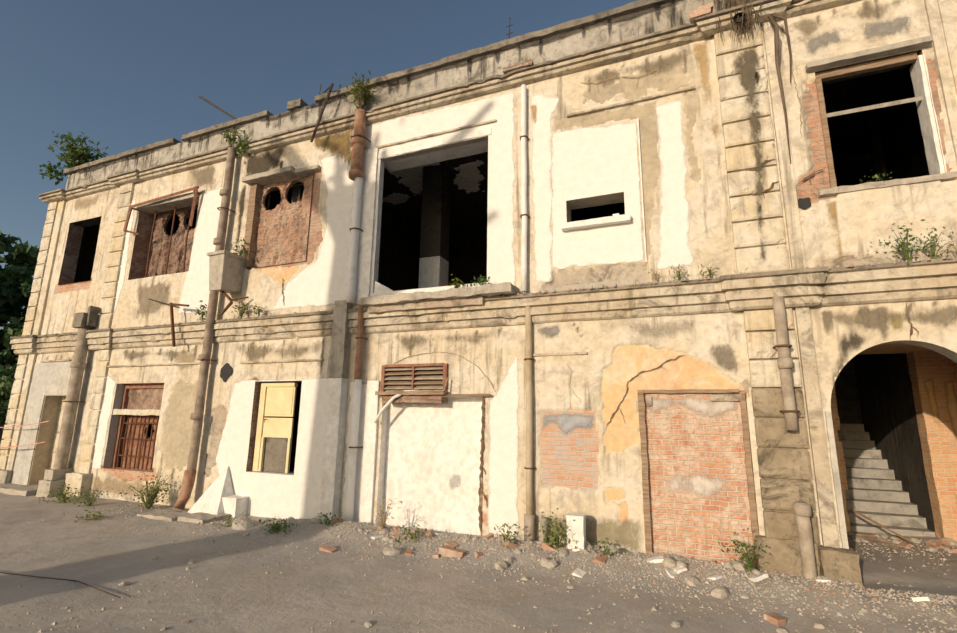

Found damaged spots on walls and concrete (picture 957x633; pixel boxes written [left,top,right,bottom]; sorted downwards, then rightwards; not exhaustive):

water stain [684,44,707,85]
water stain [735,48,763,224]
spalling [249,171,323,286]
water stain [822,311,832,331]
water stain [859,304,912,338]
crack [606,355,683,426]
water stain [834,334,863,383]
peeling [101,380,228,483]
peeling [540,344,751,524]